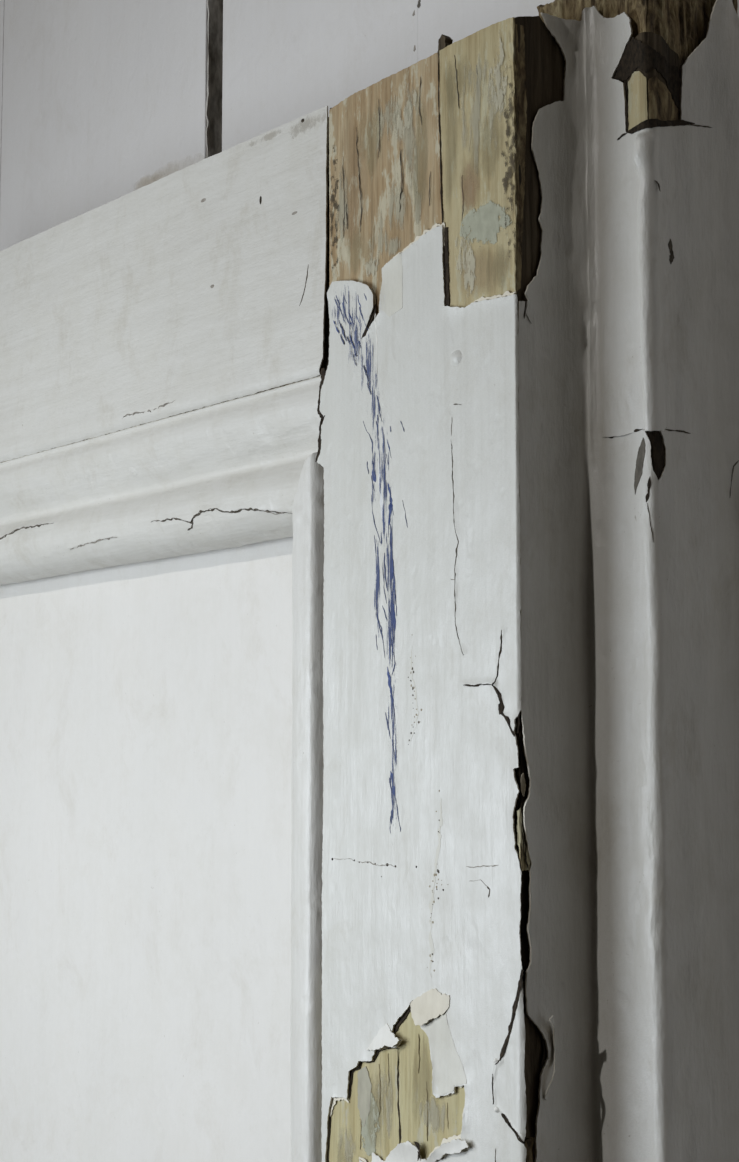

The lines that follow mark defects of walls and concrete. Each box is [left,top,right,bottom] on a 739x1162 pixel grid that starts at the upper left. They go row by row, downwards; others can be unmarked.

peeling [327,16,565,339]
peeling [613,32,712,140]
crack [0,523,52,540]
crack [72,537,117,549]
crack [154,508,292,531]
crack [451,404,463,654]
peeling [326,790,469,1162]
crack [464,630,536,1162]